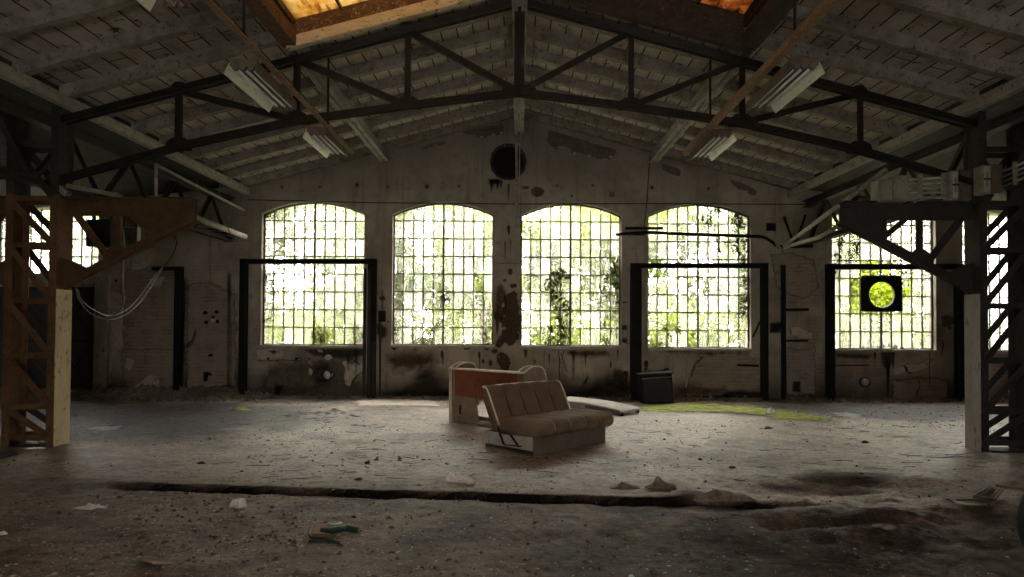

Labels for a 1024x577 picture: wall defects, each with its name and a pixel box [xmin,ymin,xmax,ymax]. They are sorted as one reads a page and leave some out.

peeling [257,348,362,386]